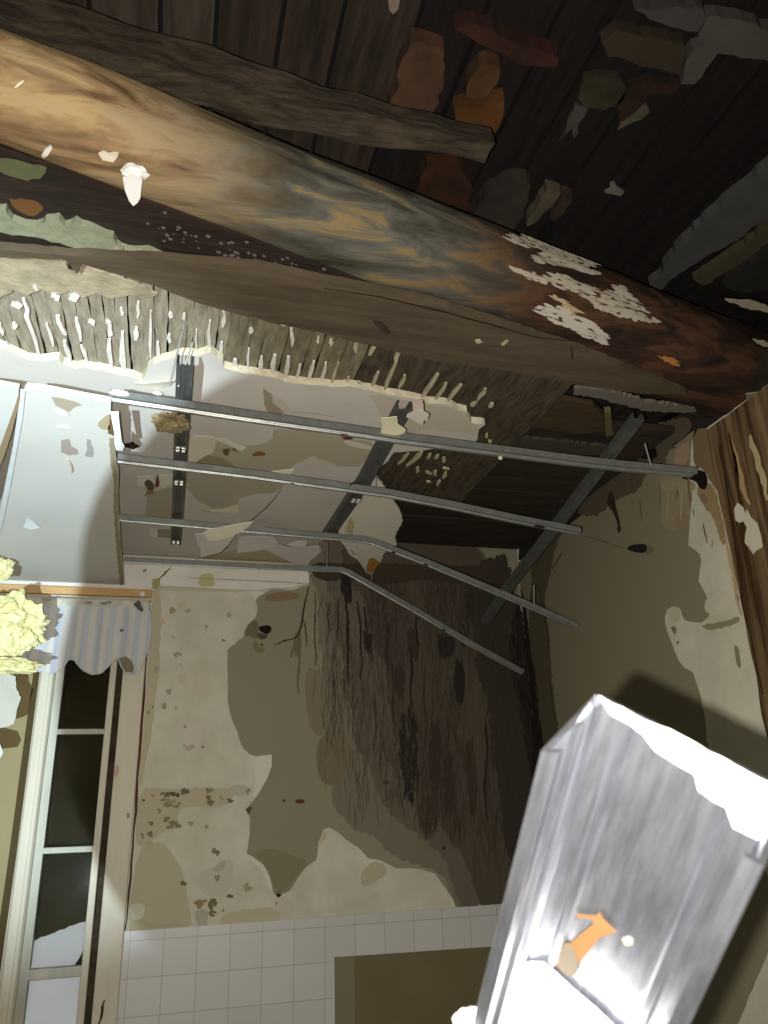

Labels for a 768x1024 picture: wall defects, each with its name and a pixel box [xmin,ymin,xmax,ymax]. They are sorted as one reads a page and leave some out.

spalling [98,150,150,206]
spalling [604,180,624,196]
peeling [502,233,661,345]
spalling [111,411,125,451]
peeling [368,394,479,435]
peeling [734,503,763,554]
flaking render [479,547,532,638]
flaking render [545,431,711,750]
flaking render [137,429,457,907]
leakage [290,417,726,907]
leakage [128,568,306,931]
flaking render [690,869,768,1024]